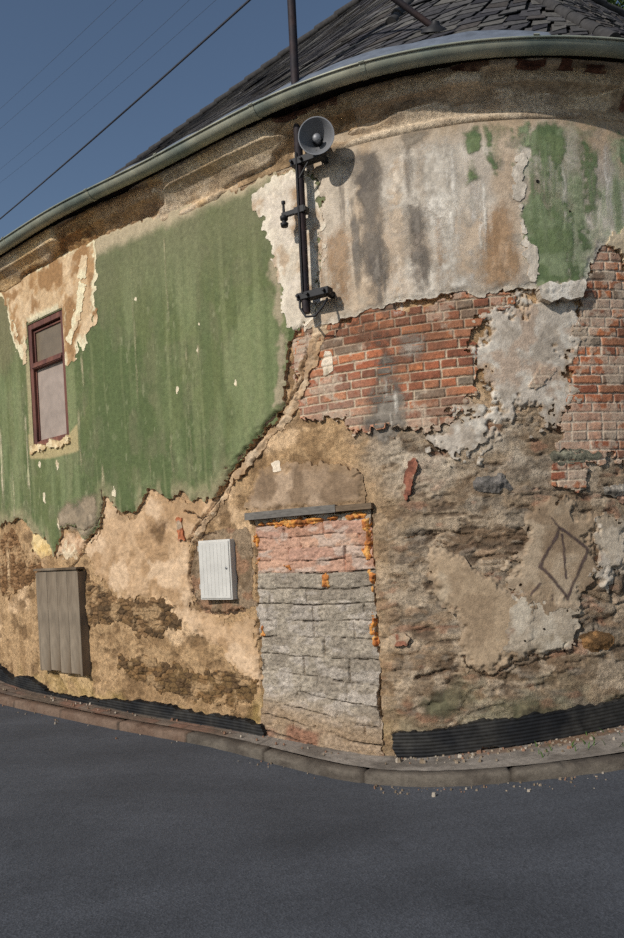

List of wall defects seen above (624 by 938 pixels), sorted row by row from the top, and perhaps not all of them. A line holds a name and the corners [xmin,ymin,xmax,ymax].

flaking render [450,60,489,72]
flaking render [515,58,547,70]
leakage [339,131,487,310]
peeling [0,220,98,366]
flaking render [237,96,516,438]
flaking render [511,122,624,493]
flaking render [401,458,418,501]
spalling [0,528,43,601]
spalling [84,574,182,639]
flaking render [175,517,186,541]
spalling [188,527,260,614]
spalling [117,653,259,712]